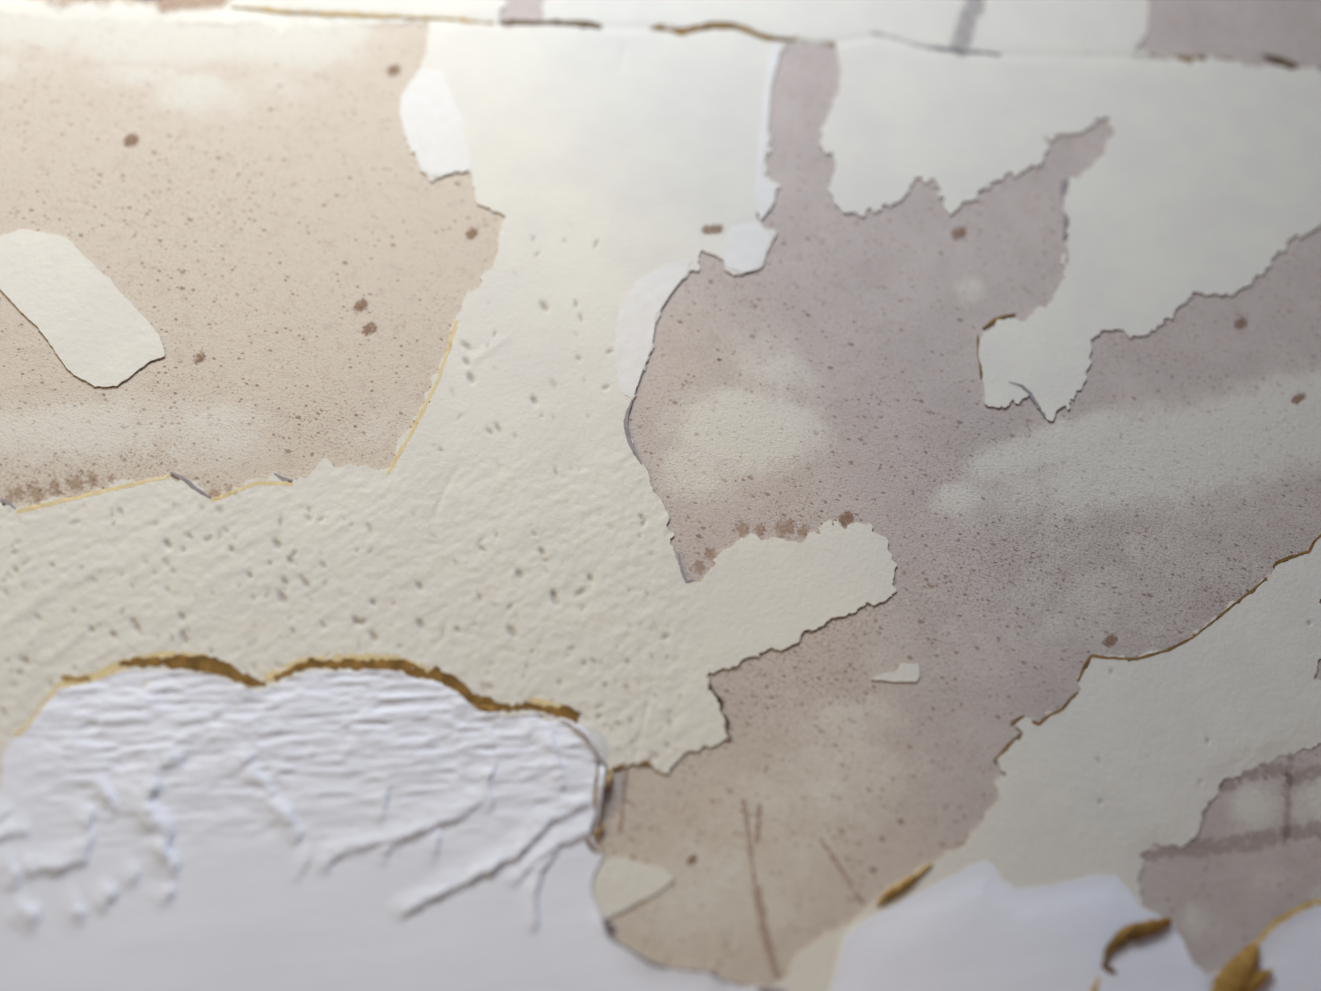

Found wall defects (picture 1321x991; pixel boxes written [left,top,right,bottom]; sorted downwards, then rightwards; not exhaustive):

peeling [0,0,505,513]
peeling [1135,0,1321,70]
peeling [560,42,1321,988]